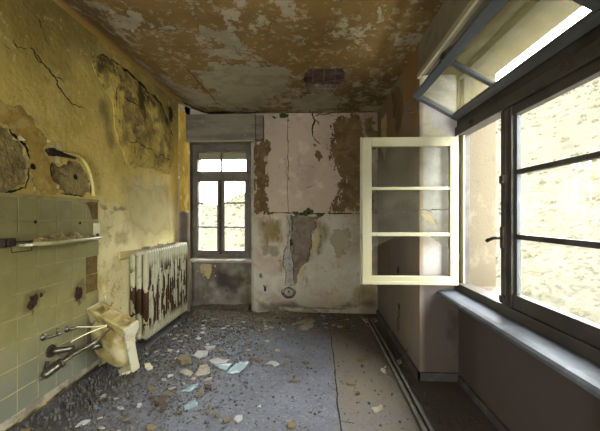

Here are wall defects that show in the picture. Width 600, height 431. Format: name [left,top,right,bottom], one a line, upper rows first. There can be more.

peeling [107,10,180,35]
crack [5,40,83,108]
peeling [155,24,293,109]
flaking render [303,68,346,89]
peeling [0,101,98,219]
peeling [254,139,273,215]
crack [256,111,360,280]
peeling [290,86,404,286]
corrosion [27,293,43,310]